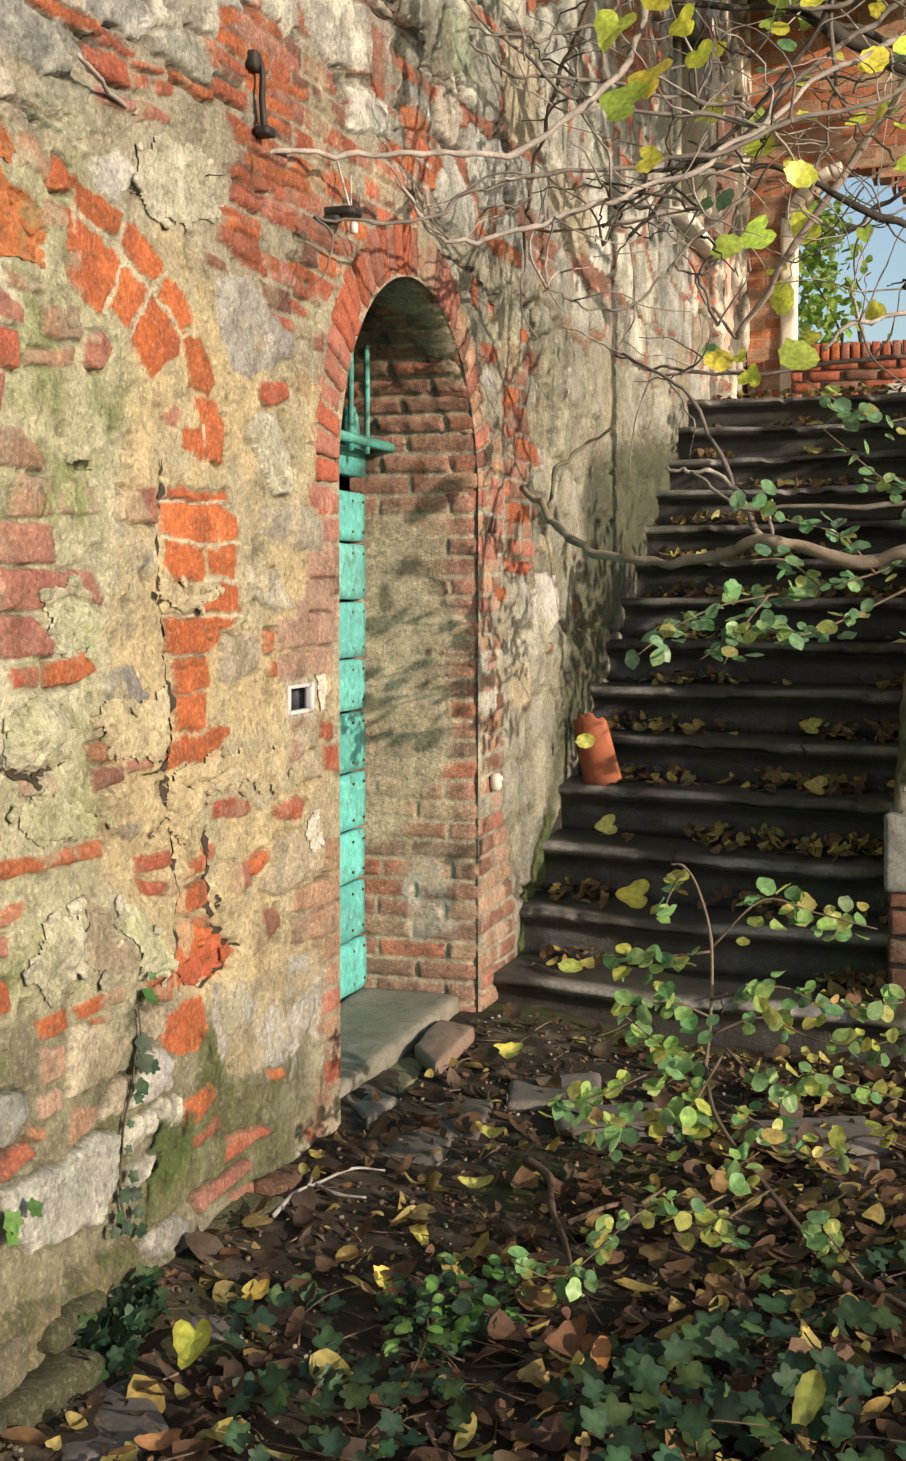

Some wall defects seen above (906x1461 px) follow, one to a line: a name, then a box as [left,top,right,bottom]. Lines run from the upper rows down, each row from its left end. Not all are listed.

crack [143,459,240,989]